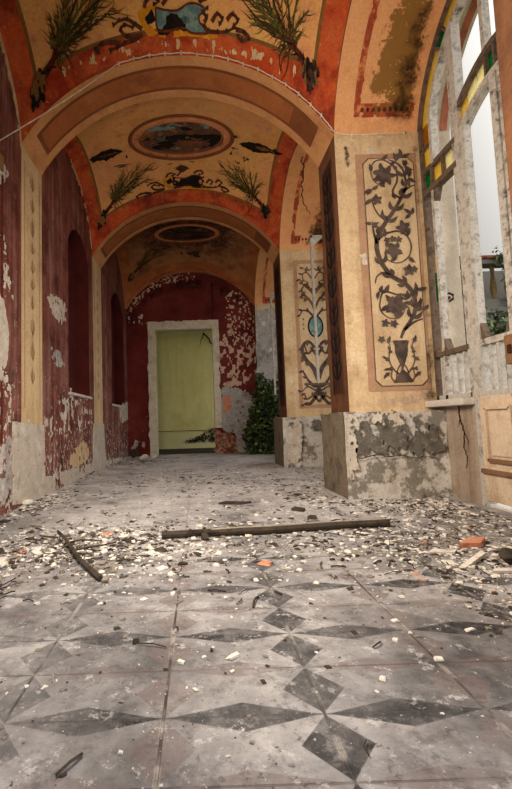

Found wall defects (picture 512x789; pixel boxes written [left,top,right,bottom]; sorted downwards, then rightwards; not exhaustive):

crack [300,156,310,213]
peeling [128,272,195,325]
crack [200,283,216,345]
peeling [0,233,145,507]
spalling [213,290,256,454]
crack [458,406,468,468]